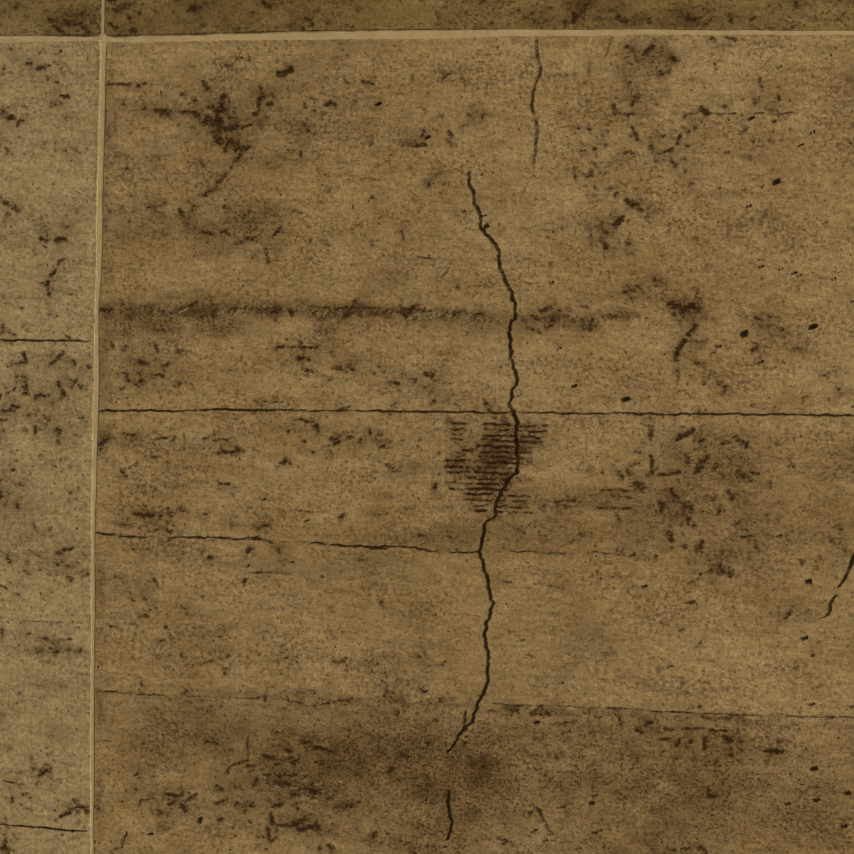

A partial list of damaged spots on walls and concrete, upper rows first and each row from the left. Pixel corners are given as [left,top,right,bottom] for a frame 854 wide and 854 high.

crack [521,39,543,198]
crack [447,160,520,754]
leakage [432,399,774,584]
crack [823,556,854,618]